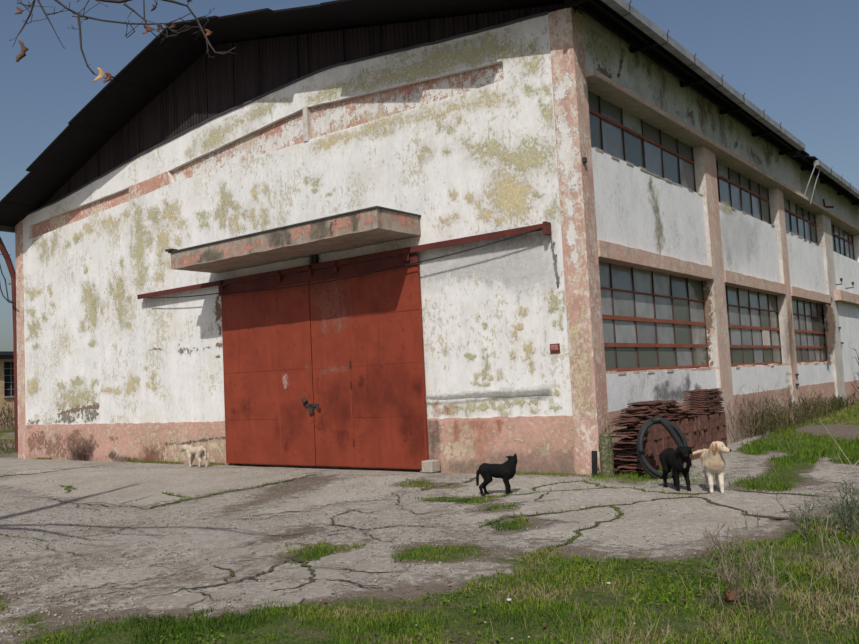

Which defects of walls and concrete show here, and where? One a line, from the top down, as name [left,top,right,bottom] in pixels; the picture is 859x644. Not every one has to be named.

peeling [175,28,582,267]
damp [649,178,663,251]
peeling [32,200,204,346]
flaking render [213,295,223,358]
flaking render [27,365,156,460]
flaking render [109,424,231,465]